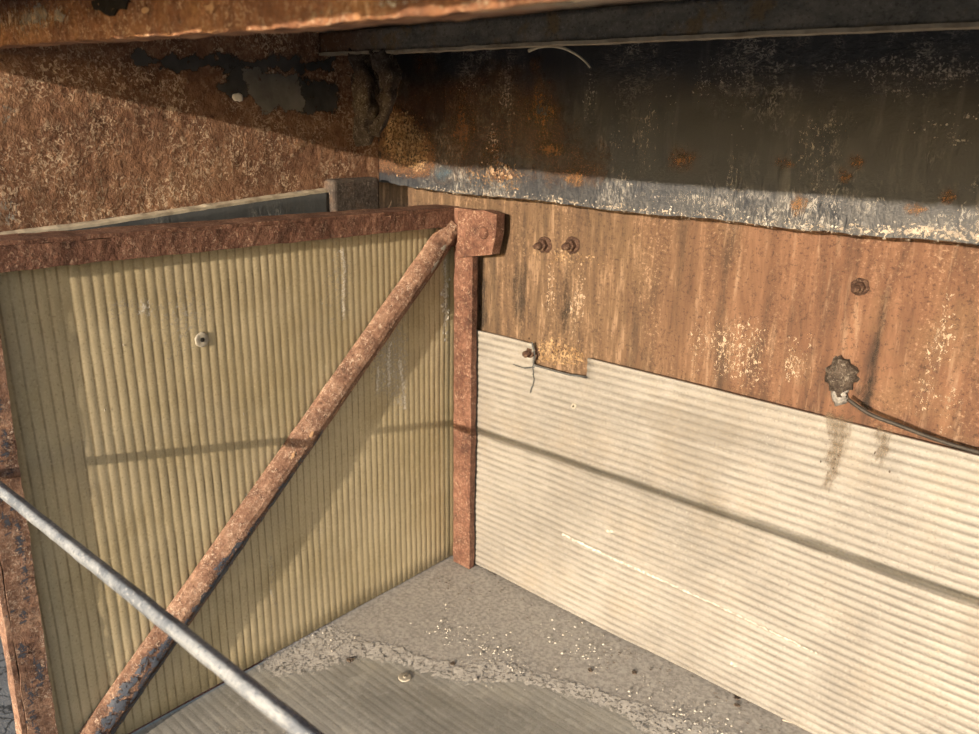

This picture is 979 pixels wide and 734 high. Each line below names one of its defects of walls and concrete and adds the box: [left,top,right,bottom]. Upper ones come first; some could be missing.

peeling [0,1,70,36]
leakage [845,46,979,102]
corrosion [378,105,441,178]
corrosion [461,155,522,202]
leakage [652,151,780,224]
leakage [790,115,849,213]
leakage [920,202,979,246]
corrosion [523,250,604,342]